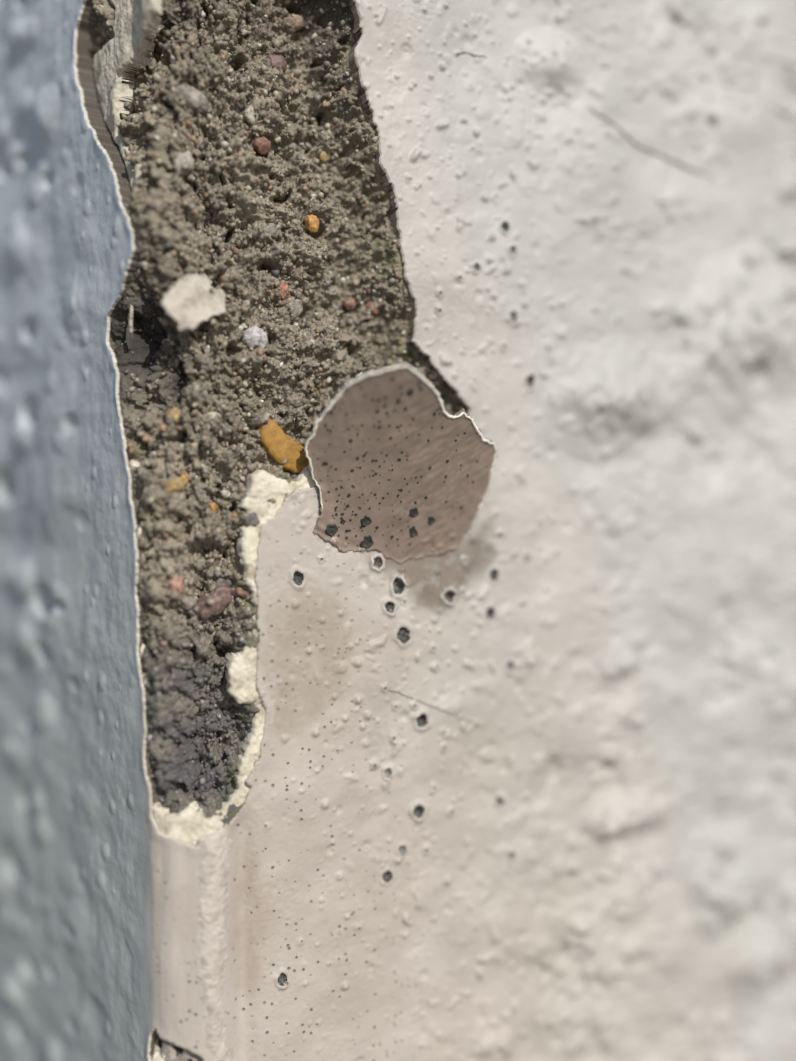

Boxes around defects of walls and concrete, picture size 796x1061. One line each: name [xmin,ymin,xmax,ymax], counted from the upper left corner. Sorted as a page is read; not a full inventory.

spalling [90,0,498,845]
spalling [152,1034,203,1061]